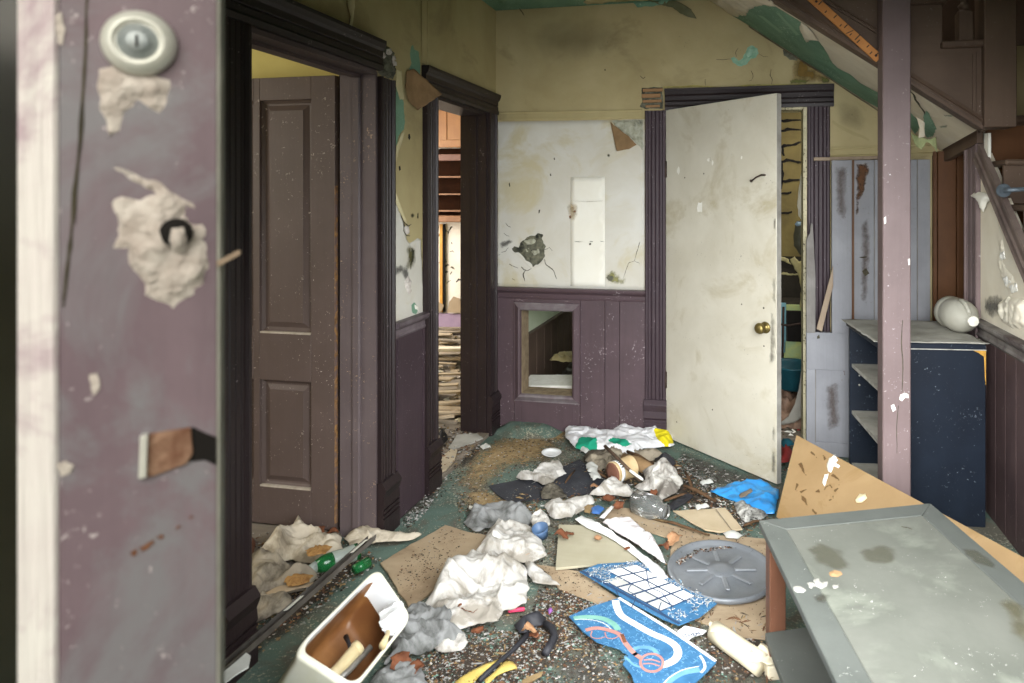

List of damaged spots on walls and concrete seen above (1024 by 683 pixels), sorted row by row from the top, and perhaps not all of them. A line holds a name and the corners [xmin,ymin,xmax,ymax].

peeling [714,0,878,111]
spalling [608,120,643,156]
peeling [911,92,948,153]
flaking render [396,204,423,321]
spalling [510,231,557,281]
peeling [997,238,1018,296]
peeling [89,373,100,396]